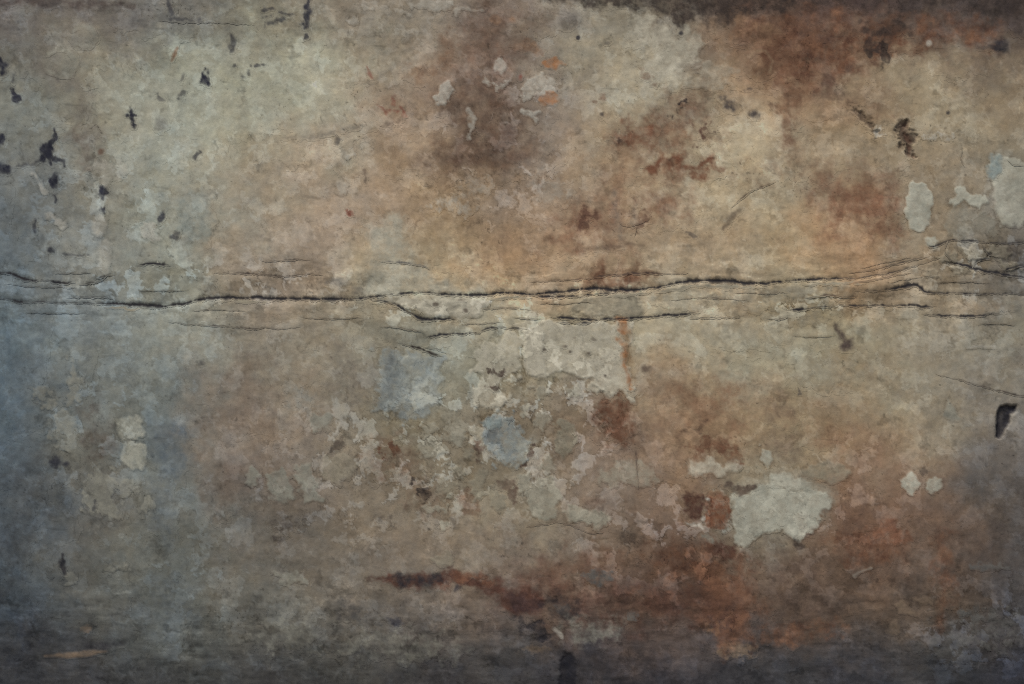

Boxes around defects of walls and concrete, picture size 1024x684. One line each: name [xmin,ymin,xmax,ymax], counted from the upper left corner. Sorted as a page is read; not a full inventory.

rust [331,0,1008,318]
leakage [0,31,559,684]
peeling [416,309,584,533]
crack [0,238,1024,357]
peeling [559,456,664,535]
rust [355,312,872,666]
hole [995,403,1019,440]